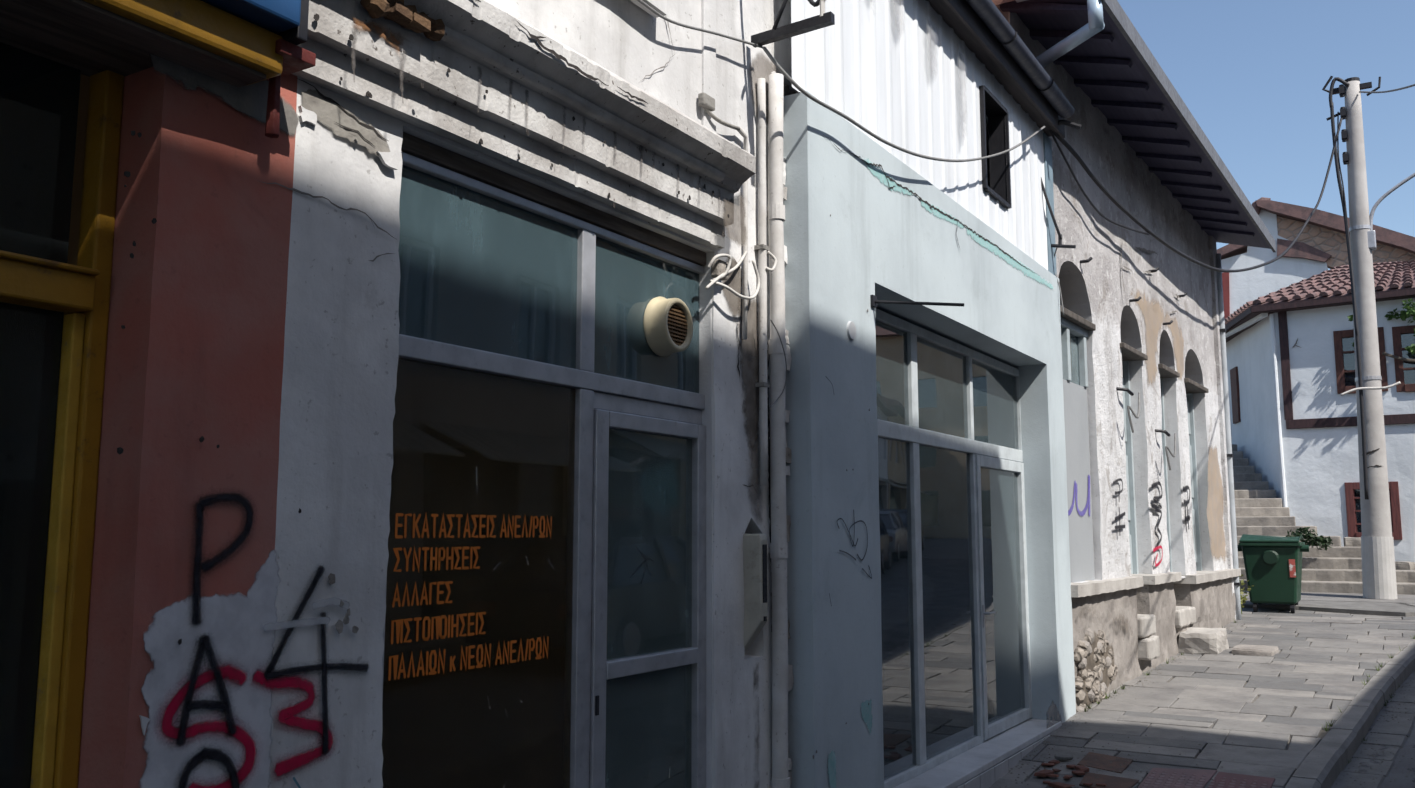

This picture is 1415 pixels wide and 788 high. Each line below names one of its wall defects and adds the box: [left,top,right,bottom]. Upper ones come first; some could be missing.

rust [356,20,402,47]
spalling [298,90,398,170]
crack [259,181,397,262]
crack [823,134,1037,274]
peeling [139,550,280,788]